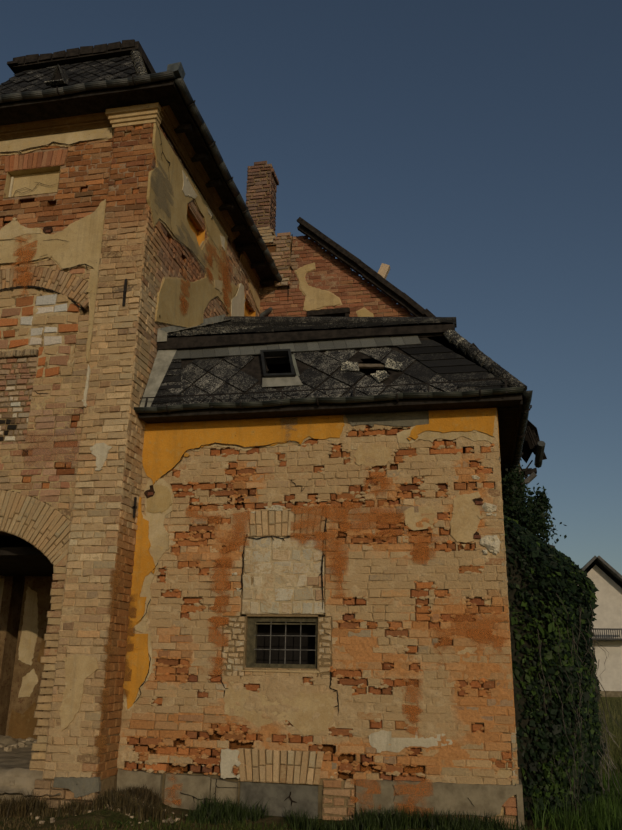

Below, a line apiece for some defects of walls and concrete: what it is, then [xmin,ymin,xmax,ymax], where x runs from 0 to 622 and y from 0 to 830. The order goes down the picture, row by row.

crack [0,137,107,155]
peeling [0,127,114,156]
peeling [132,123,260,328]
peeling [295,262,342,312]
peeling [0,199,106,407]
peeling [356,307,374,317]
spalling [54,462,75,475]
peeling [90,443,113,471]
peeling [123,408,507,711]
spalling [123,718,453,782]
spalling [489,750,519,781]